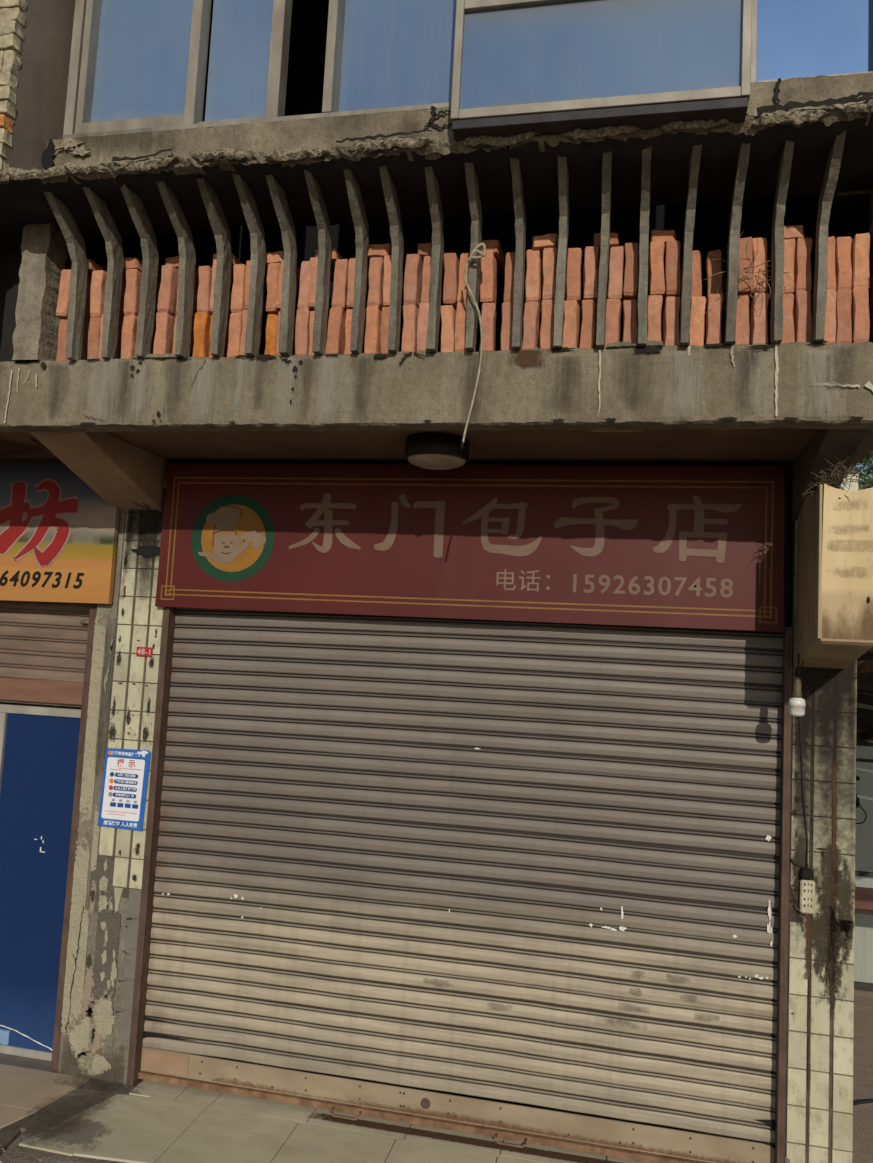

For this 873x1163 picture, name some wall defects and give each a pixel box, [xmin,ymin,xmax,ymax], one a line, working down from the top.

spalling [0,0,174,181]
spalling [191,147,249,161]
spalling [263,146,332,161]
spalling [347,136,437,152]
crack [336,106,452,143]
spalling [460,131,541,146]
spalling [562,125,639,139]
damp [90,360,118,418]
damp [675,346,699,412]
peeling [61,609,150,1076]
damp [792,758,856,1015]
rust [359,1103,731,1163]